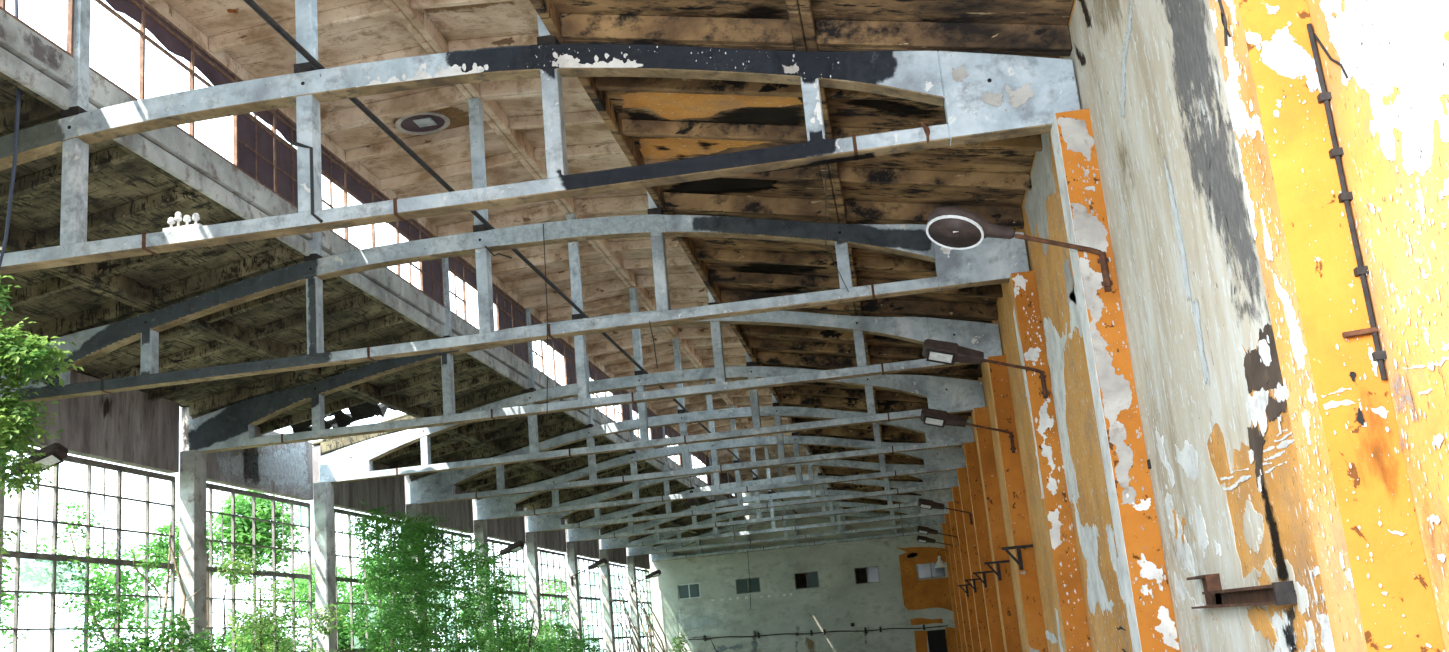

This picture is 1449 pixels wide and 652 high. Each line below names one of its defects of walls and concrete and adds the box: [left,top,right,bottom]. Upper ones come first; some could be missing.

peeling [552,52,643,68]
damp [1093,0,1133,118]
peeling [1012,0,1335,652]
damp [1164,158,1210,385]
damp [1161,0,1270,322]
peeling [1320,0,1449,235]
peeling [1340,552,1354,588]